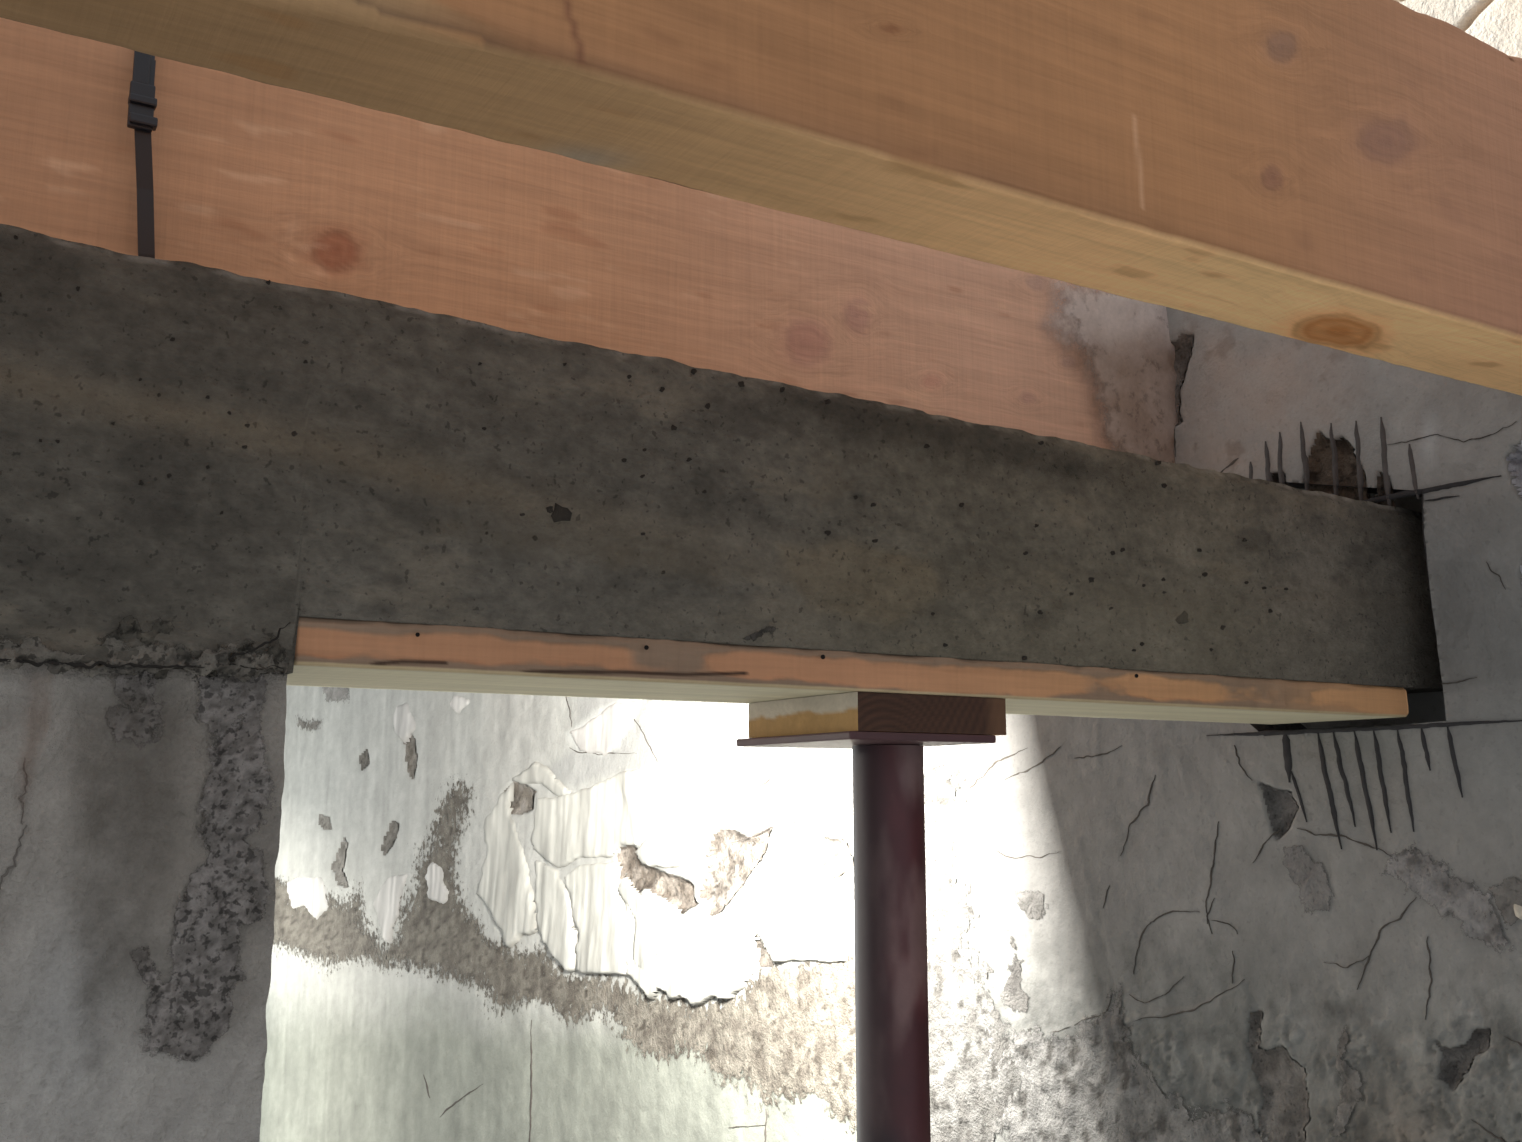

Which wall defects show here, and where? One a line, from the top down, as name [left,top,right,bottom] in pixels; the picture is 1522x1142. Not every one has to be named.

flaking render [1171,334,1193,426]
flaking render [1272,433,1398,517]
crack [0,623,289,670]
flaking render [393,703,417,779]
crack [954,745,1122,801]
crack [1103,775,1156,908]
flaking render [1259,784,1334,915]
crack [1253,828,1392,863]
flaking render [273,762,857,1133]
flaking render [924,758,1310,1142]
crack [1052,821,1245,1032]
crack [1324,897,1433,1020]